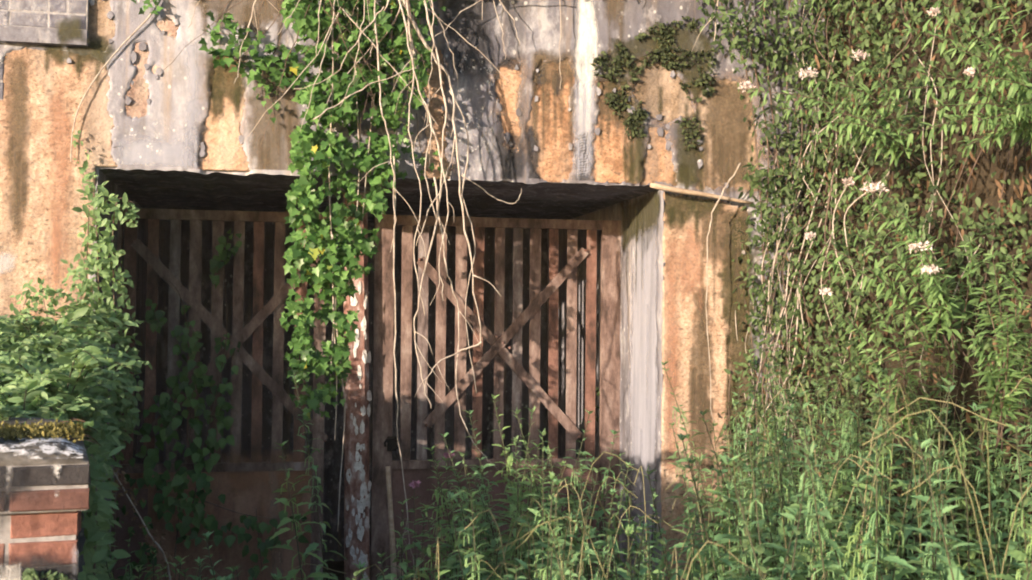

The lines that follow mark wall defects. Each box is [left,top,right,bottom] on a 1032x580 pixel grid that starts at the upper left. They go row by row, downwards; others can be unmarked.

damp [8,60,27,232]
spalling [0,47,118,326]
spalling [125,42,163,119]
spalling [198,86,249,171]
spalling [494,59,576,183]
damp [533,0,642,175]
spalling [591,55,761,580]
peeling [346,281,372,580]